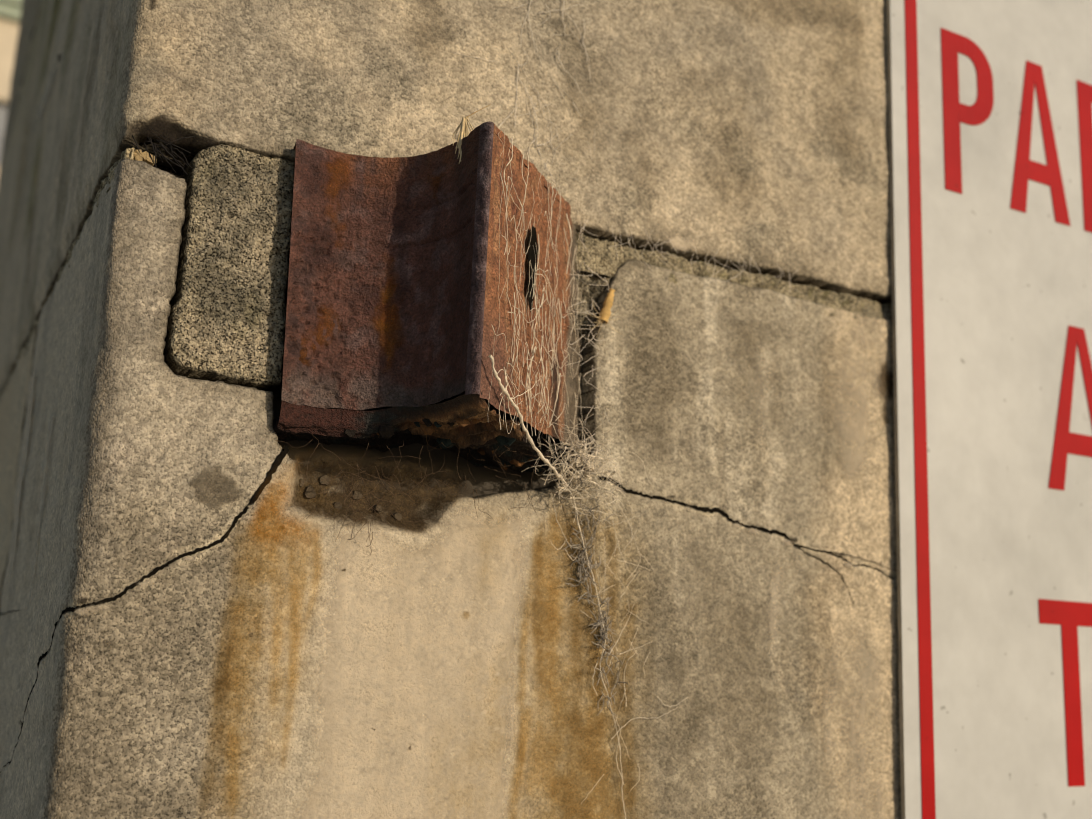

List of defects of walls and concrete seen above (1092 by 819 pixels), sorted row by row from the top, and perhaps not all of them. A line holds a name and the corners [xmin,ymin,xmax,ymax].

corrosion [253,484,303,541]
crack [598,476,895,604]
crack [1,445,289,771]